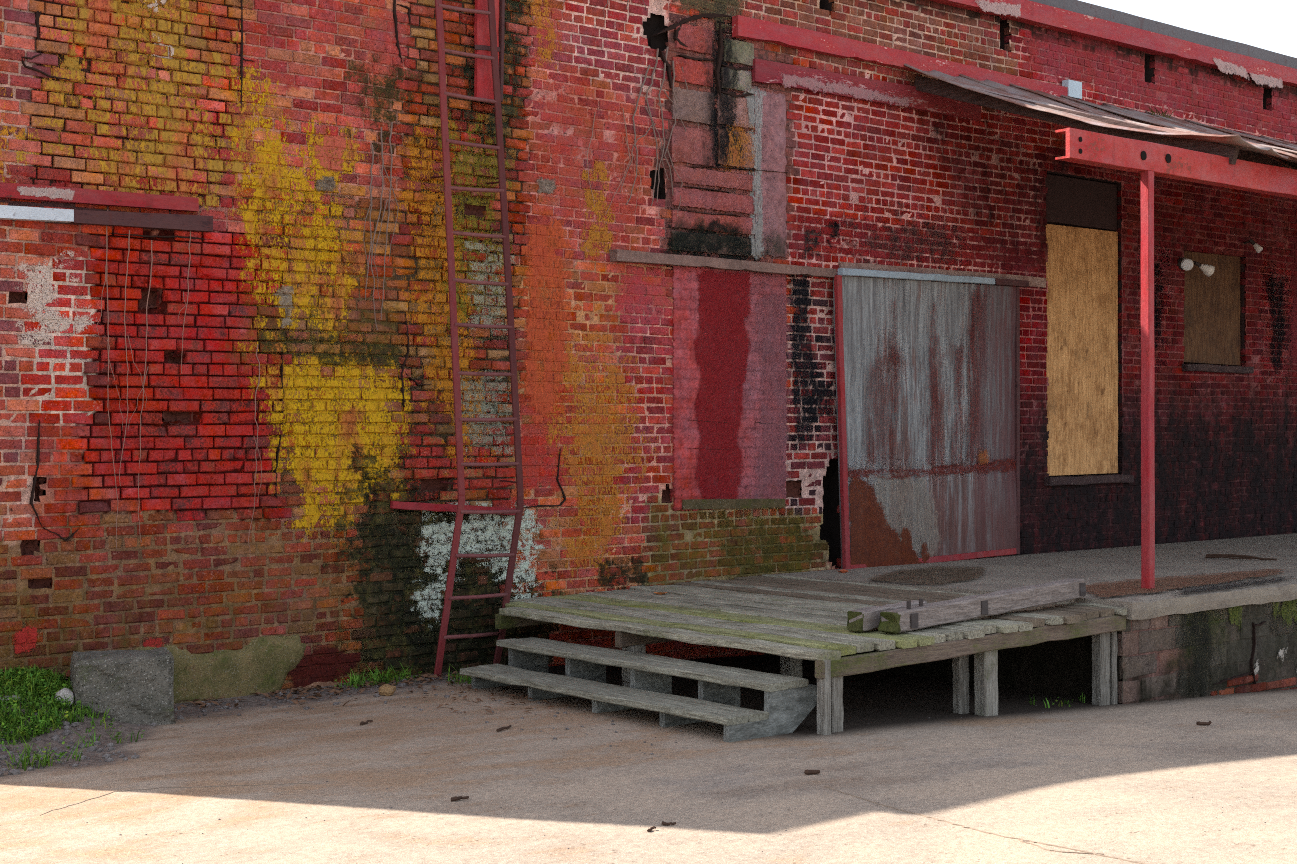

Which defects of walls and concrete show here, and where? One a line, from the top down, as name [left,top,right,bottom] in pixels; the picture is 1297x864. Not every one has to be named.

spalling [642,13,668,51]
peeling [779,72,910,107]
peeling [1213,58,1283,88]
water stain [657,2,766,499]
spalling [8,291,26,304]
peeling [19,305,97,351]
water stain [0,0,658,676]
water stain [785,221,843,450]
rust [848,290,1016,567]
water stain [718,508,829,577]
crack [824,786,1147,864]